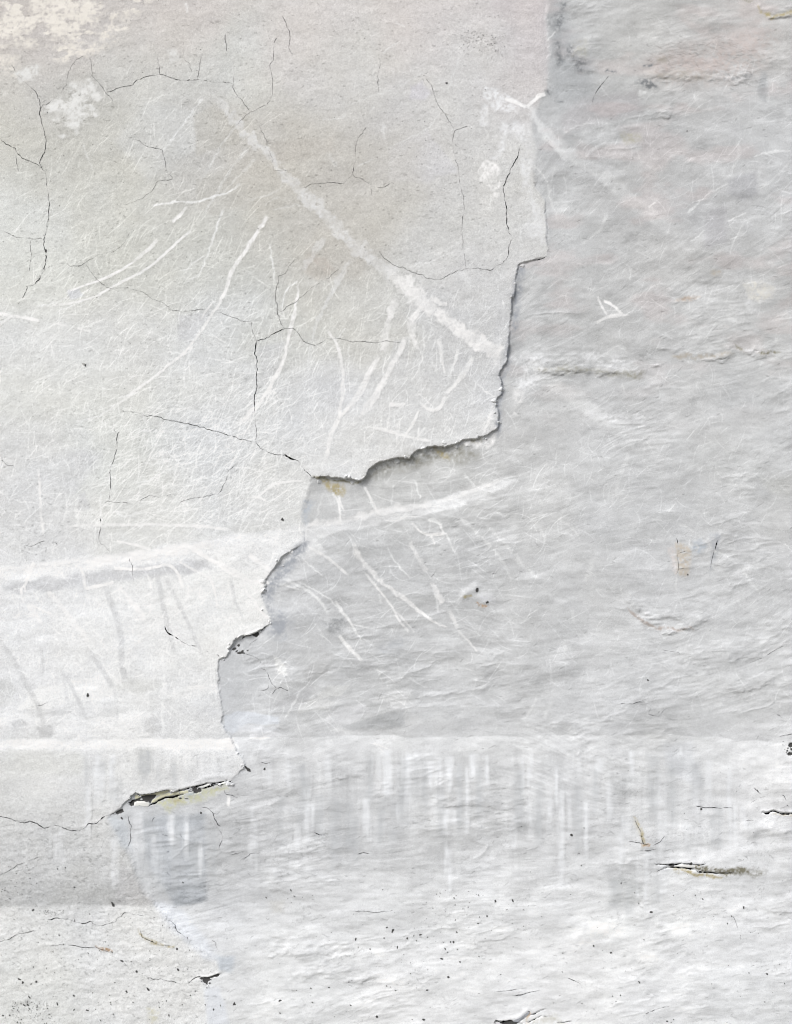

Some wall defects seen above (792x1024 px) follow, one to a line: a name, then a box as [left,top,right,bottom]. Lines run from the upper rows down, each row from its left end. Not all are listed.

crack [3,86,50,304]
crack [384,152,519,279]
peeling [477,119,551,257]
crack [78,234,393,476]
peeling [460,431,496,450]
peeling [504,348,554,419]
peeling [577,401,657,432]
peeling [666,531,723,579]
crack [0,781,252,858]
damp [82,749,220,907]
damp [261,748,491,895]
damp [508,745,749,927]